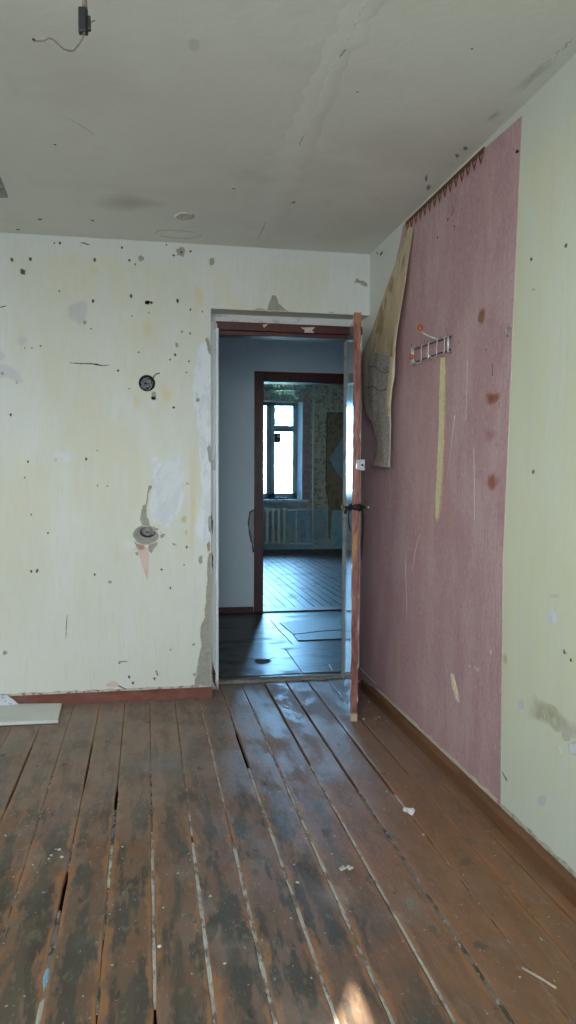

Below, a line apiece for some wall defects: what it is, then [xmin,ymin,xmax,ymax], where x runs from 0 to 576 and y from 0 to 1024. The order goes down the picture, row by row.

spalling [254,295,289,327]
spalling [133,485,177,579]
spalling [0,514,217,696]